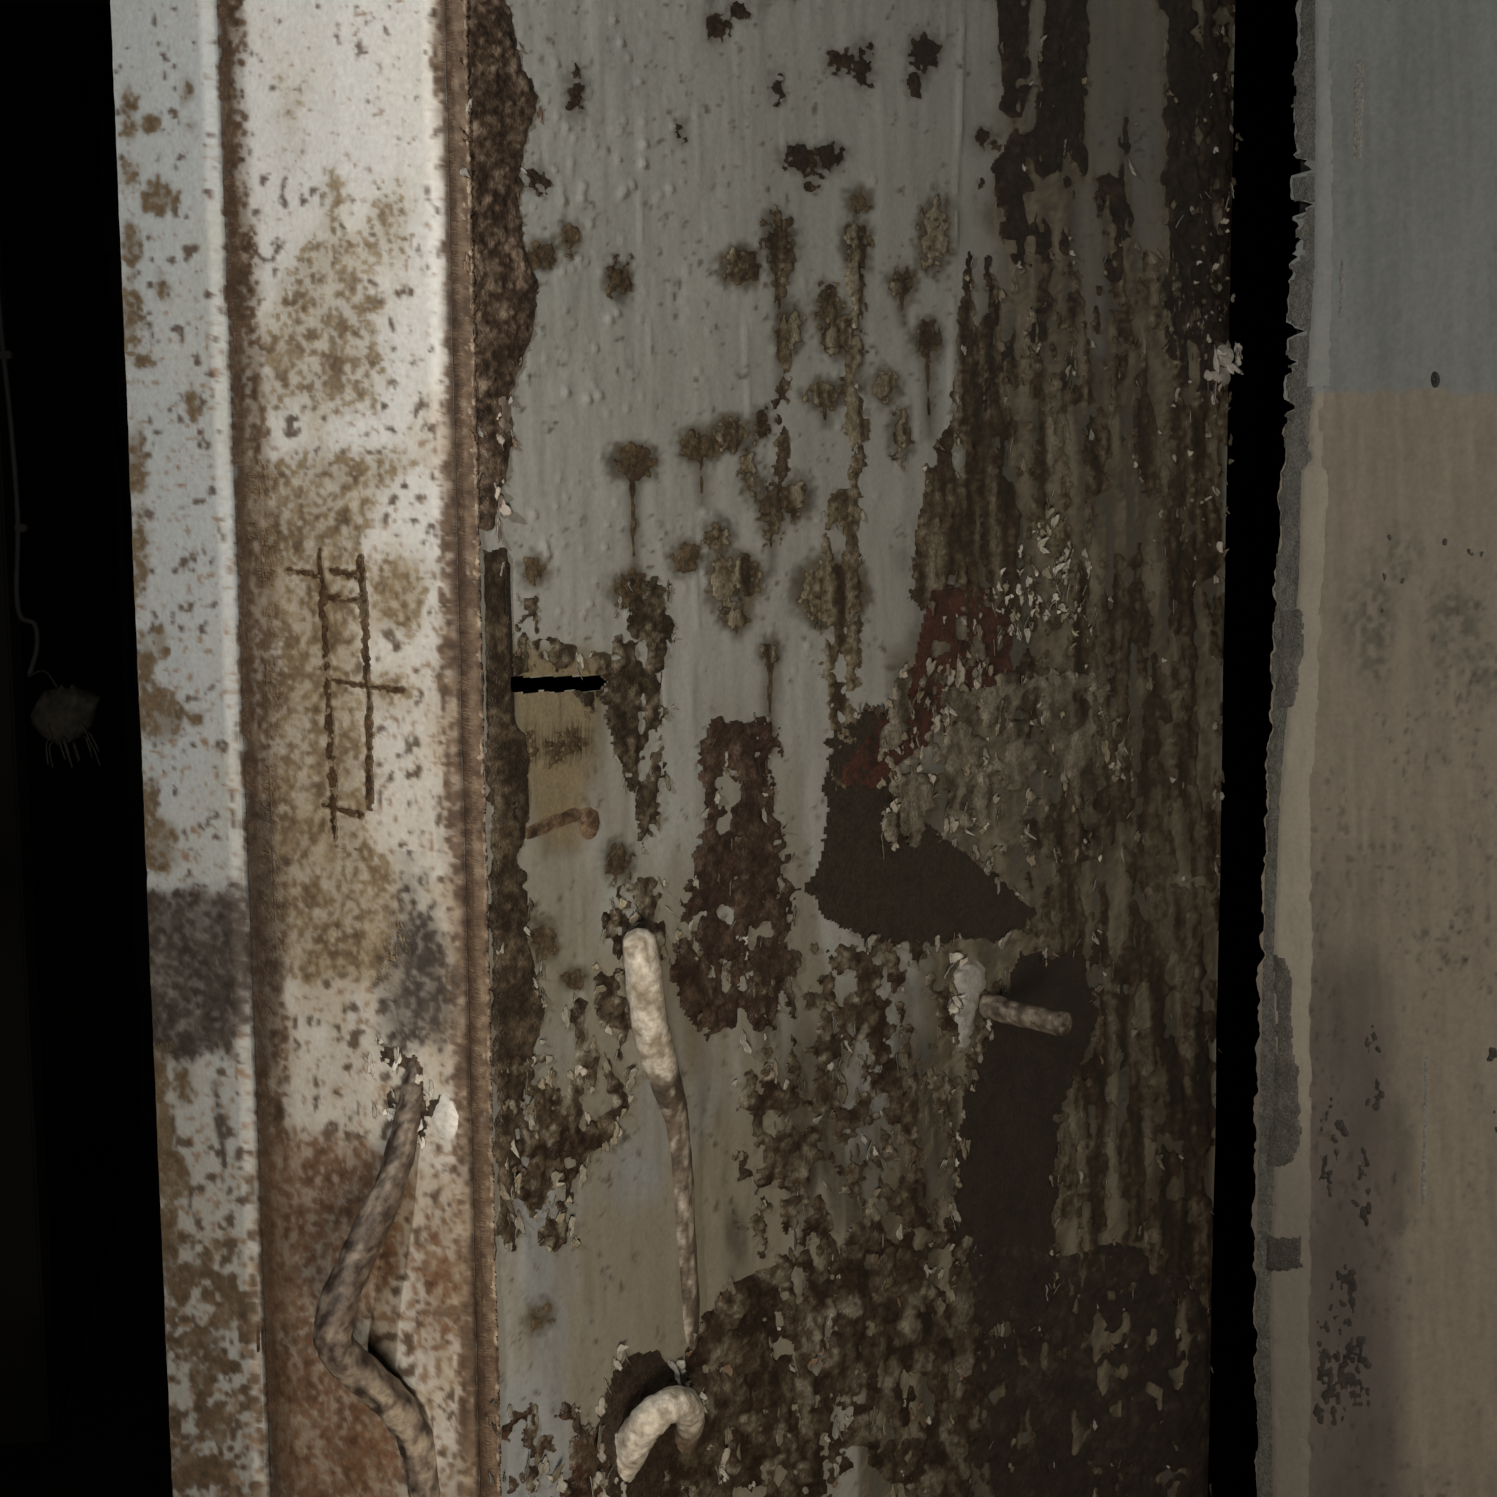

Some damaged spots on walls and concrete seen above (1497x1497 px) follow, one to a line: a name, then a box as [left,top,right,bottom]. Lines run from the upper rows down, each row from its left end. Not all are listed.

corrosion [119,93,161,137]
corrosion [121,160,181,369]
peeling [1204,342,1244,405]
peeling [496,396,512,451]
corrosion [129,441,149,493]
peeling [494,482,513,543]
corrosion [132,514,148,600]
corrosion [137,0,1244,1497]
spalling [804,586,1142,1339]